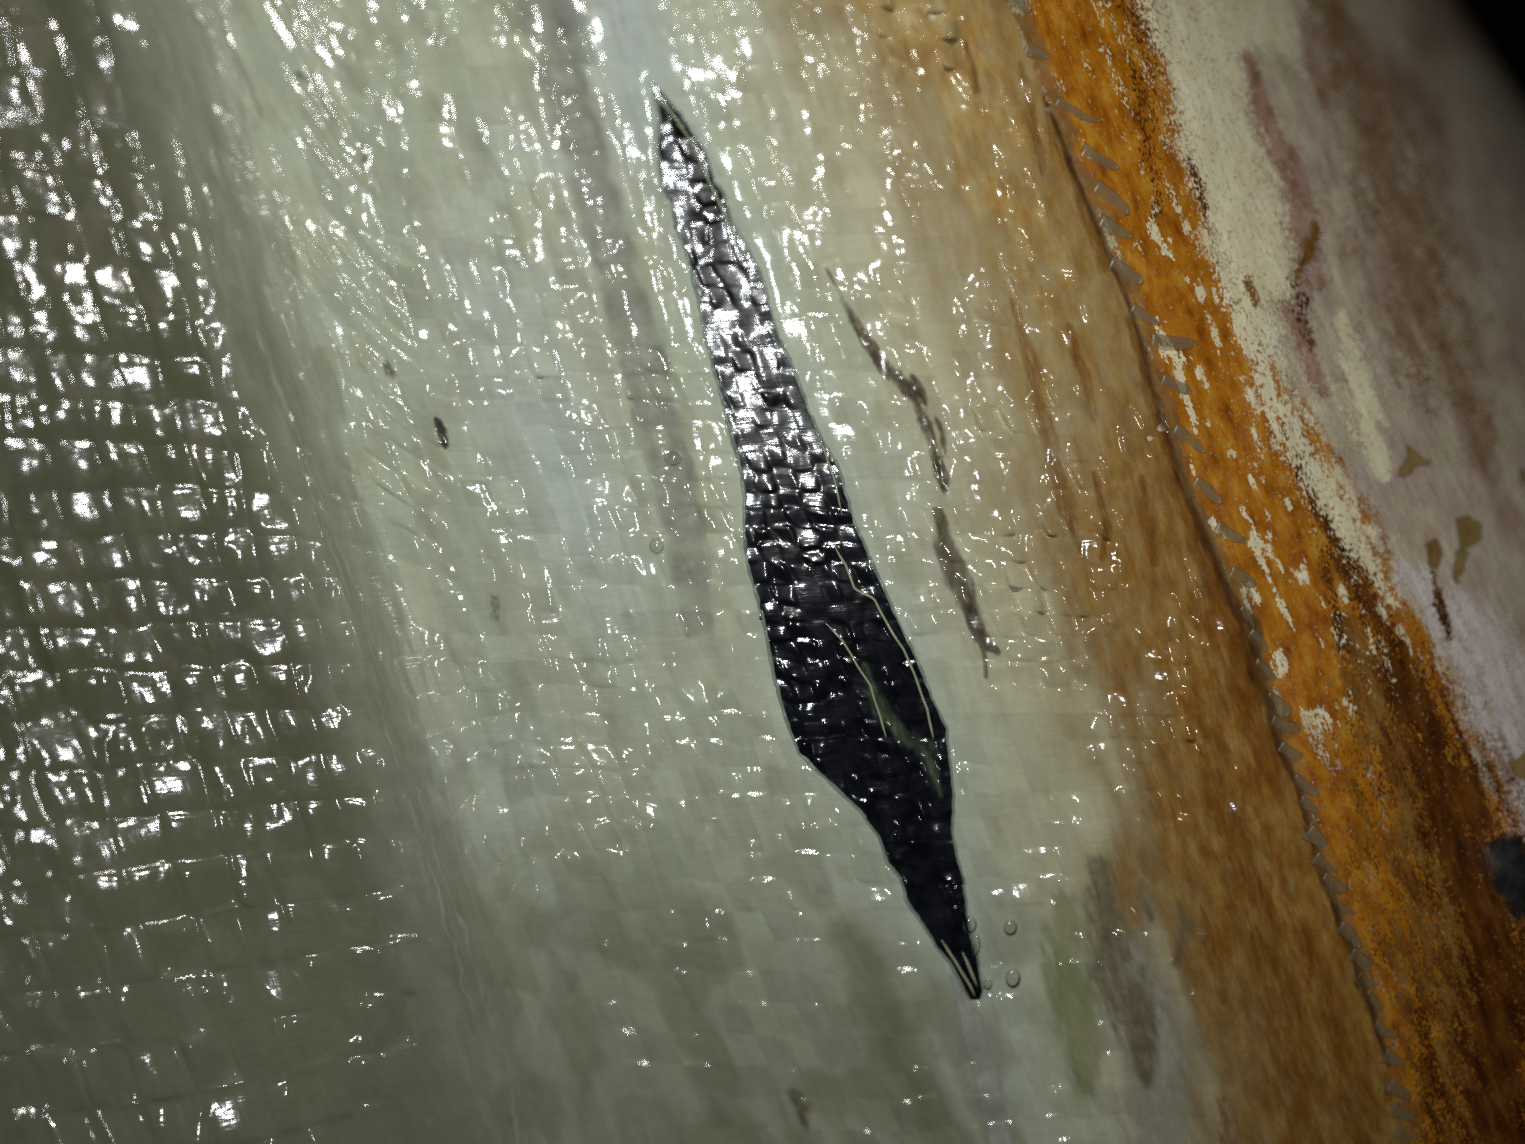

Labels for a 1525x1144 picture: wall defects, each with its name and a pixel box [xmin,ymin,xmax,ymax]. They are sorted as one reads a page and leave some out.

crack [827,271,1000,677]
rust [831,0,1525,1144]